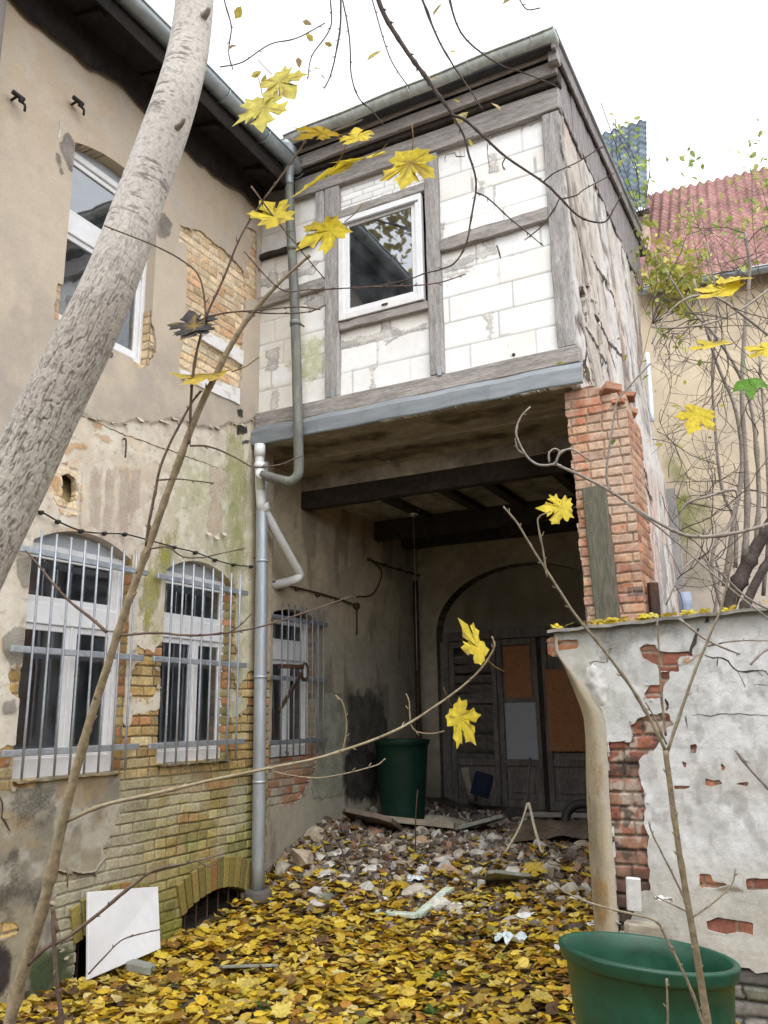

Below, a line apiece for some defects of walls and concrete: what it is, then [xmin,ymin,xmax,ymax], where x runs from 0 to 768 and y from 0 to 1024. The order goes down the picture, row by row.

crack [558,114,623,385]
flaking render [179,227,257,388]
flaking render [53,462,140,532]
leakage [226,434,247,585]
leakage [139,540,171,642]
flaking render [50,578,316,979]
leakage [312,689,388,802]
flaking render [607,642,694,932]
flaking render [700,874,727,888]
flaking render [707,917,753,935]
flaking render [746,878,768,890]